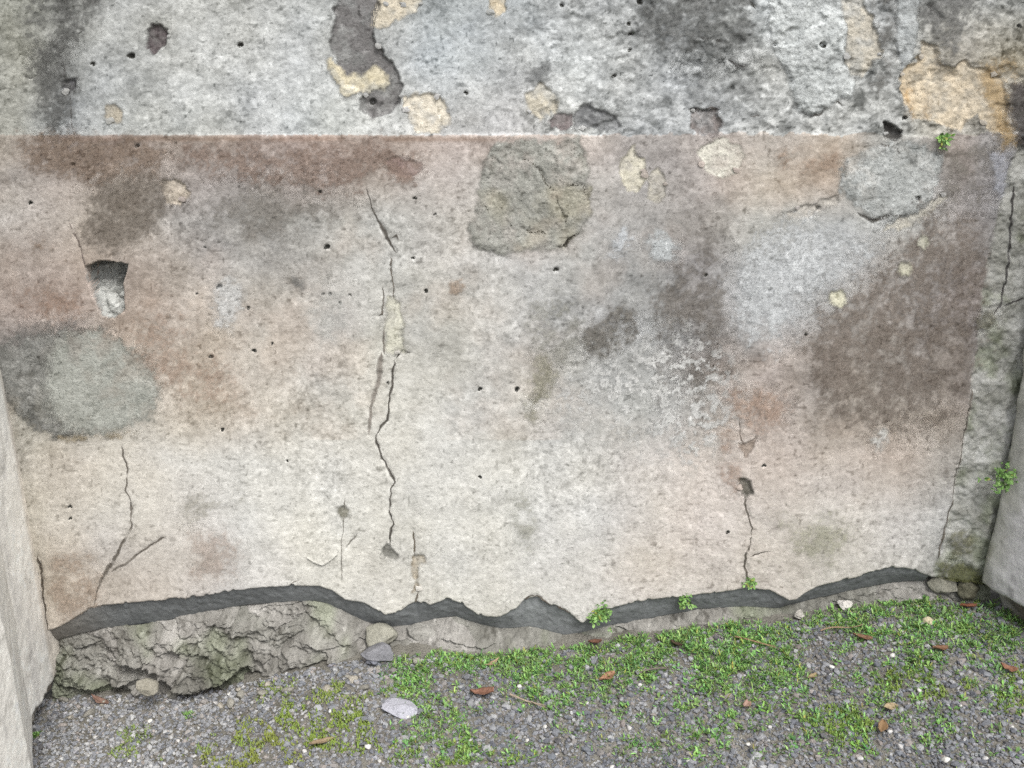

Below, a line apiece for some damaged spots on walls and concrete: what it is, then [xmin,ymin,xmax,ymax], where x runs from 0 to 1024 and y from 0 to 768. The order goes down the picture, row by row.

spalling [327,0,451,133]
spalling [899,41,1009,134]
water stain [85,177,167,246]
spalling [884,192,947,231]
crack [994,187,1024,314]
crack [366,188,415,555]
water stain [738,215,986,448]
crack [94,448,164,605]
crack [744,497,770,577]
crack [938,390,973,558]